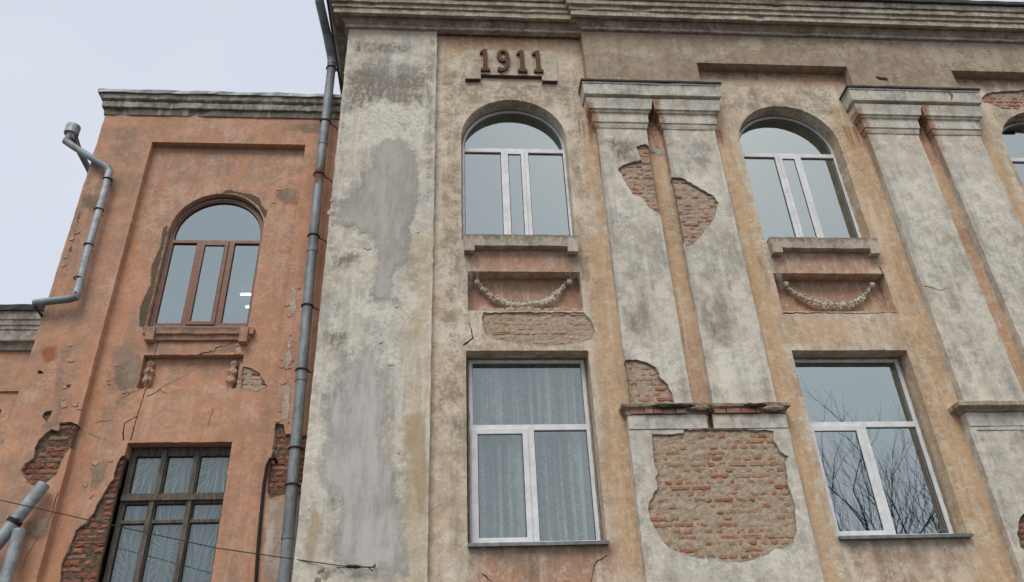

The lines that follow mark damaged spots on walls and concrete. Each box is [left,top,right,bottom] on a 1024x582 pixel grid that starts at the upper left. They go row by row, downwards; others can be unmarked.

flaking render [982,90,1024,118]
flaking render [618,144,662,214]
flaking render [672,178,718,246]
flaking render [139,226,167,326]
flaking render [478,307,595,347]
flaking render [21,382,79,486]
flaking render [60,456,126,582]
crack [89,341,234,441]
flaking render [210,343,307,582]
flaking render [625,360,674,403]
flaking render [648,423,797,563]